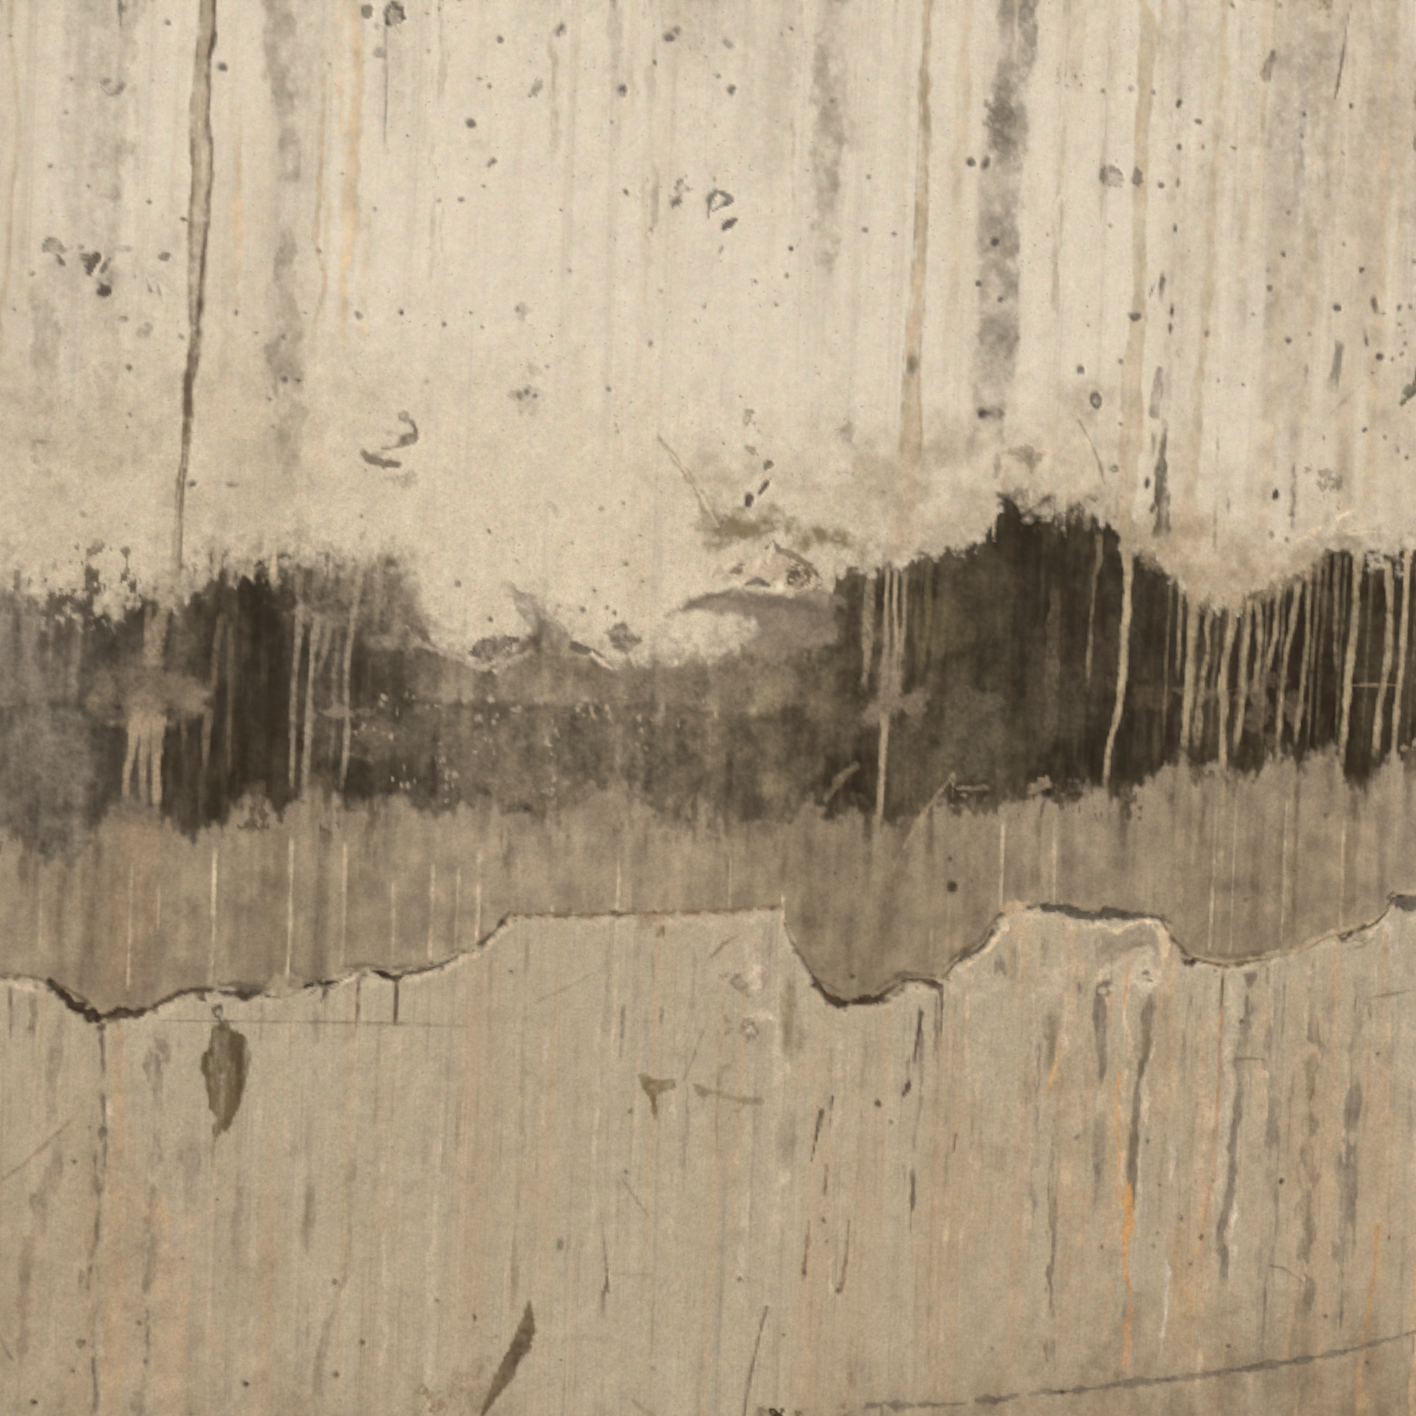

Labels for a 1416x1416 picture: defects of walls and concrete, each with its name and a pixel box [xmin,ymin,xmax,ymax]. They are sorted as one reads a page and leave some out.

corrosion [6,983,42,1044]
water stain [0,978,409,1416]
crack [0,912,523,1185]
water stain [418,1050,469,1416]
crack [567,904,658,923]
corrosion [618,1004,628,1065]
water stain [815,1030,869,1377]
crack [767,897,1299,1099]
corrosion [962,918,1198,1378]
corrosion [1218,978,1227,1011]
water stain [1192,936,1339,1363]
crack [1337,890,1416,951]